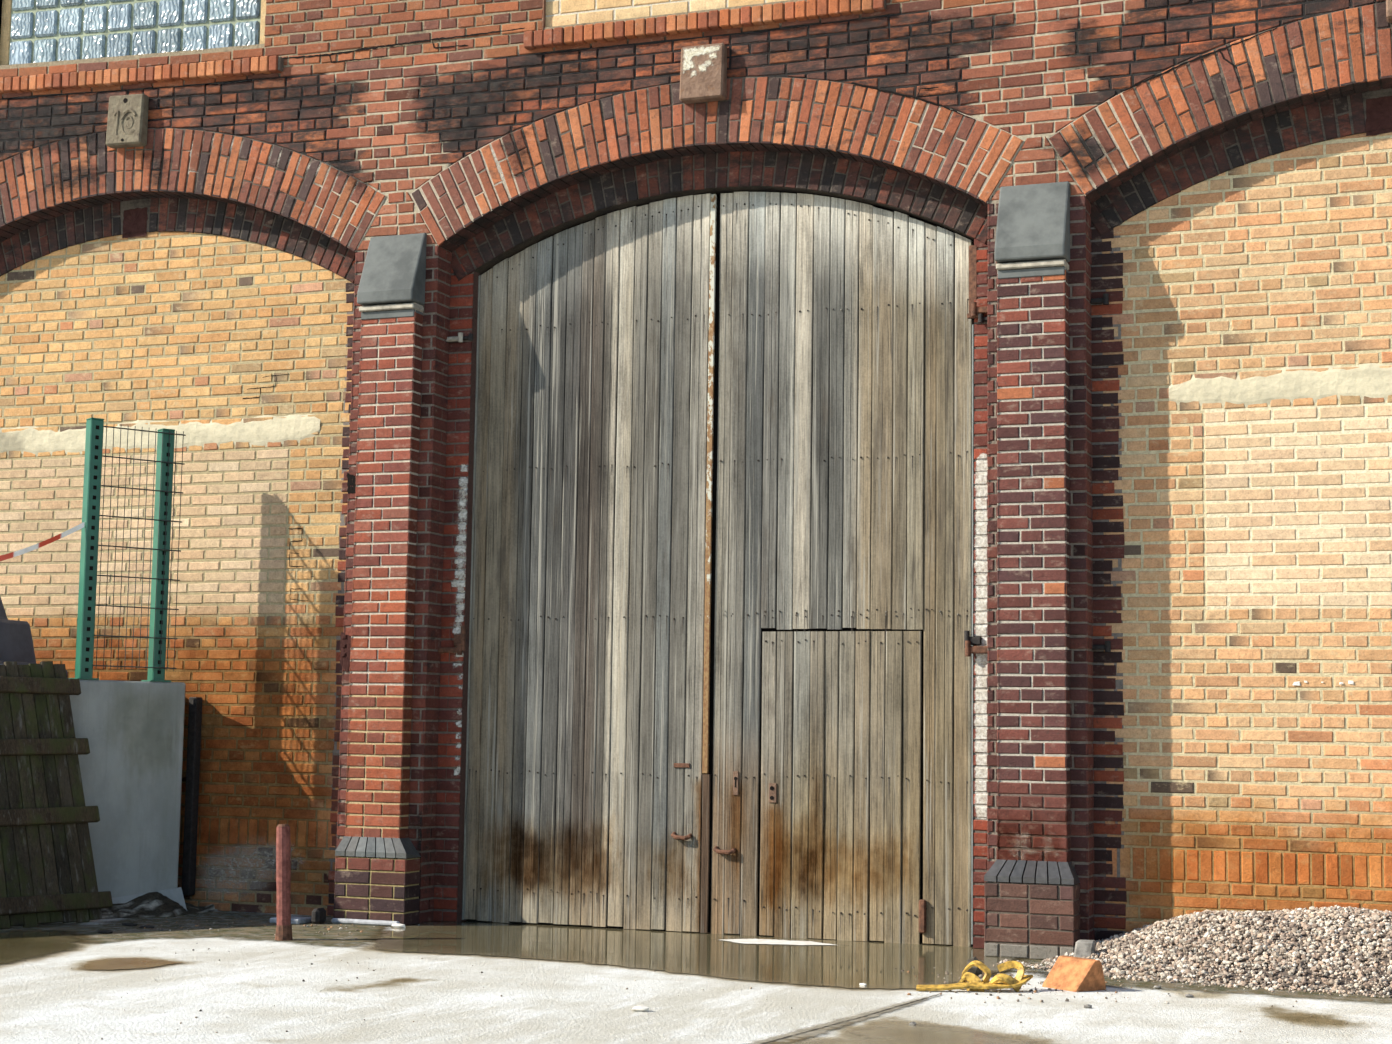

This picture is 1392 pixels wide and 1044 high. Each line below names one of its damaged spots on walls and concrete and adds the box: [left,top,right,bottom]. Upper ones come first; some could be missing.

crack [243,374,289,399]
crack [288,528,314,601]